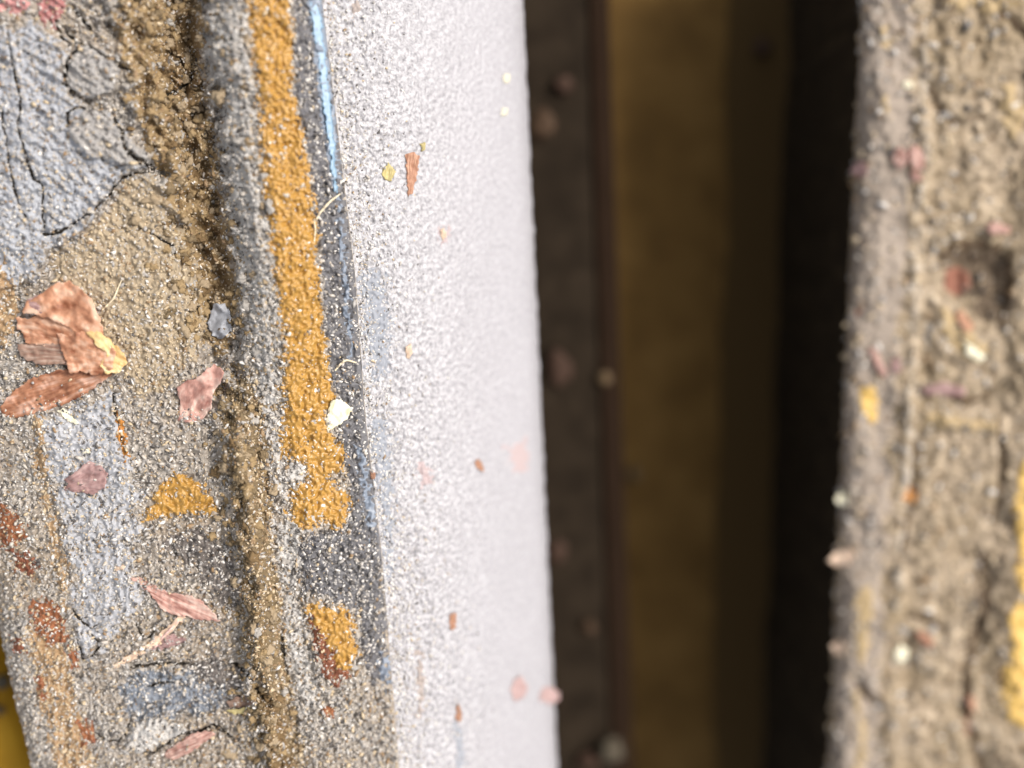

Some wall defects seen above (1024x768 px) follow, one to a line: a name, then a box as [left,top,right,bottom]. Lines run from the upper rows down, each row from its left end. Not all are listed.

crack [0,4,153,236]